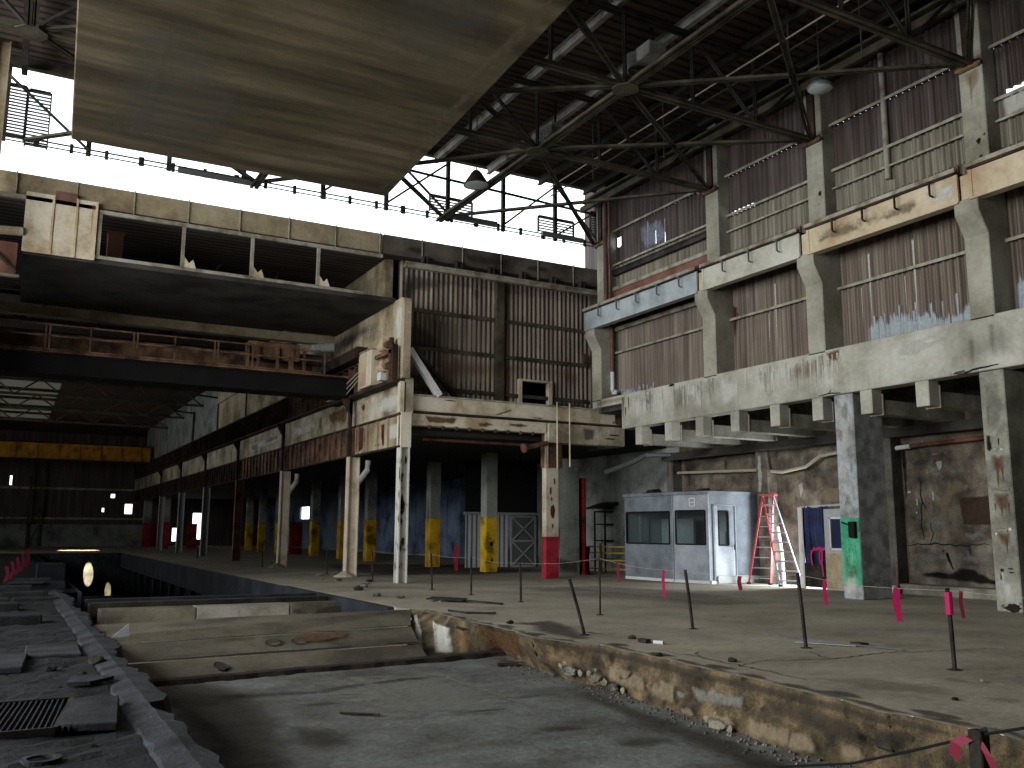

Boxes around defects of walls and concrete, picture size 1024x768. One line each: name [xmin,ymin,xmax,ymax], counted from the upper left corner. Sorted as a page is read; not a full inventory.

crack [907,478,989,556]
rust [994,457,1009,514]